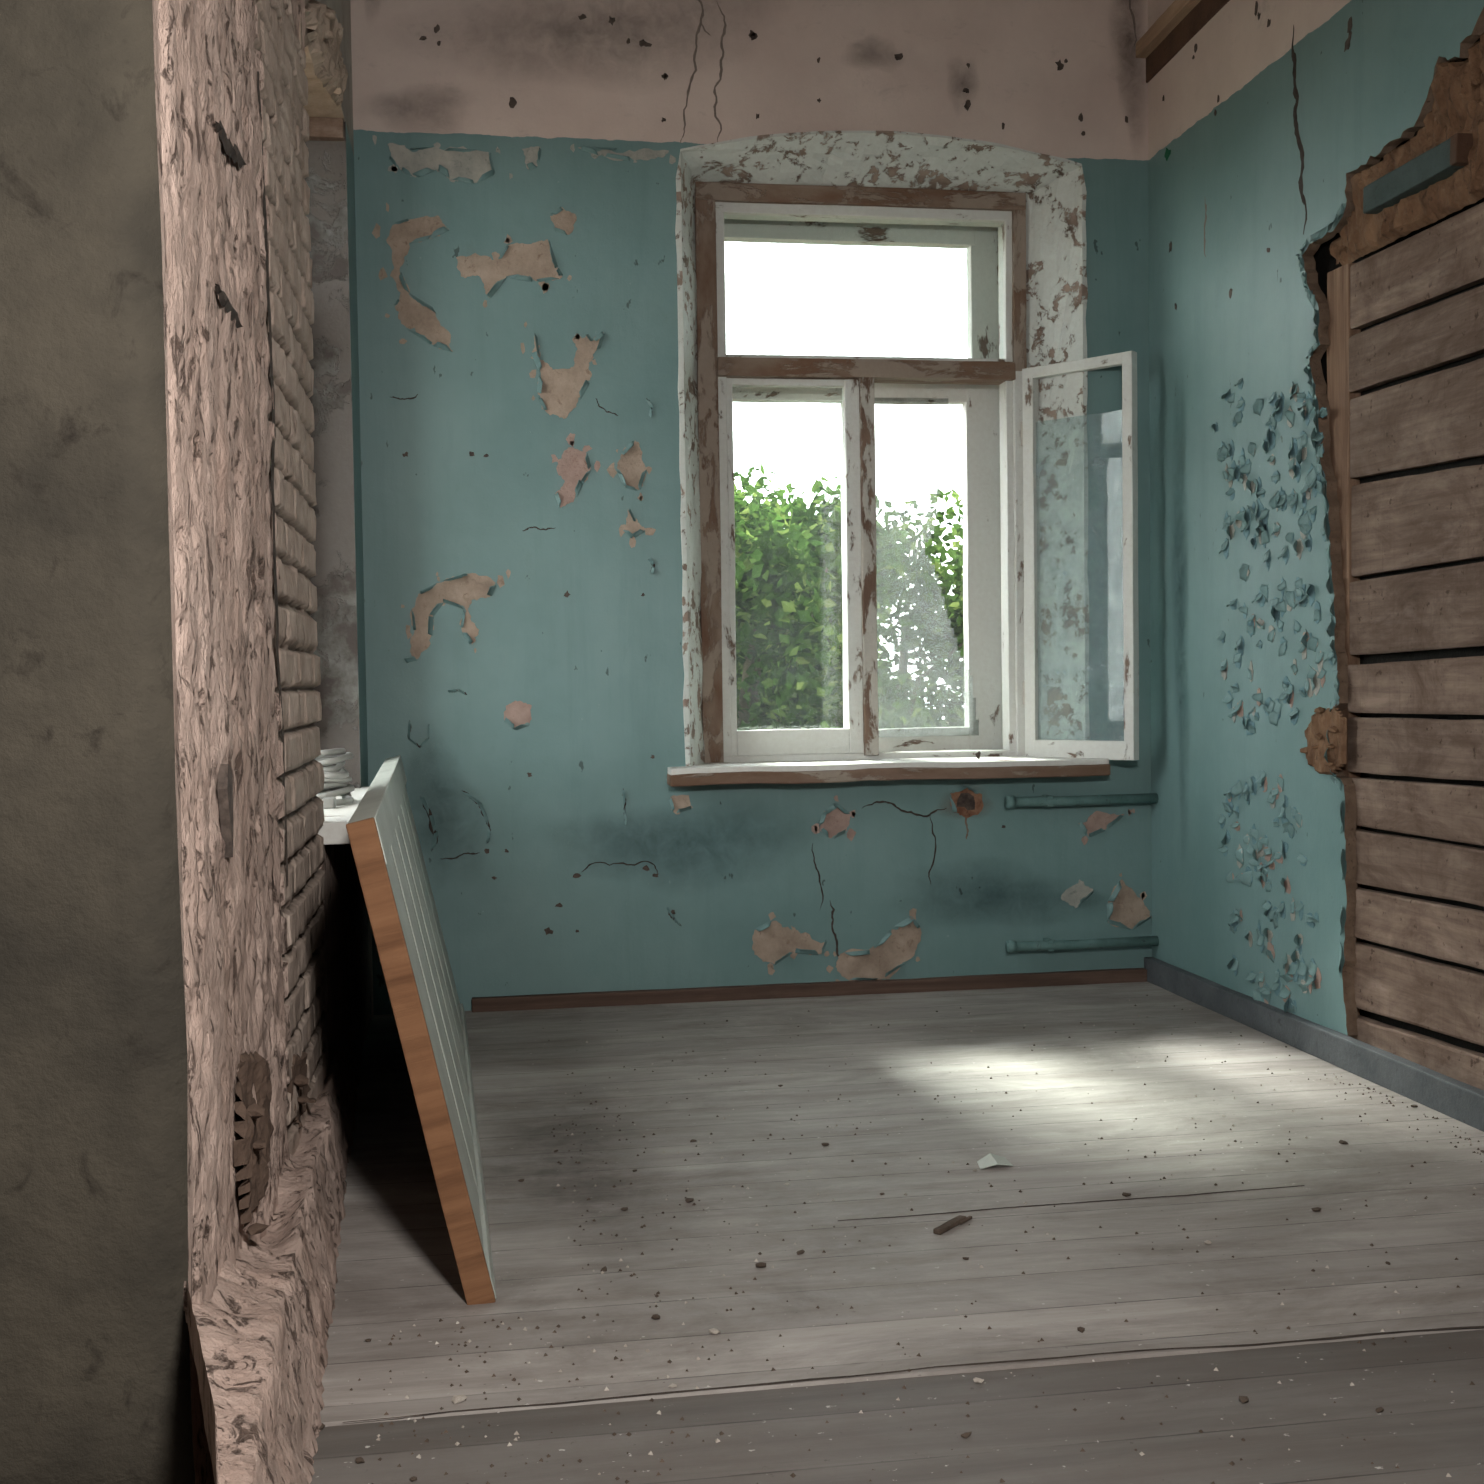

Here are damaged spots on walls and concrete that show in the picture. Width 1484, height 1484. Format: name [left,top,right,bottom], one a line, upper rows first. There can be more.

peeling [373,135,541,184]
crack [680,0,727,143]
crack [1291,25,1307,235]
peeling [372,203,452,352]
peeling [456,206,577,308]
peeling [521,322,656,548]
flaking render [1211,32,1484,879]
peeling [401,569,511,663]
crack [812,844,839,959]
peeling [752,908,922,981]
crack [864,801,946,883]
peeling [1218,771,1322,1014]